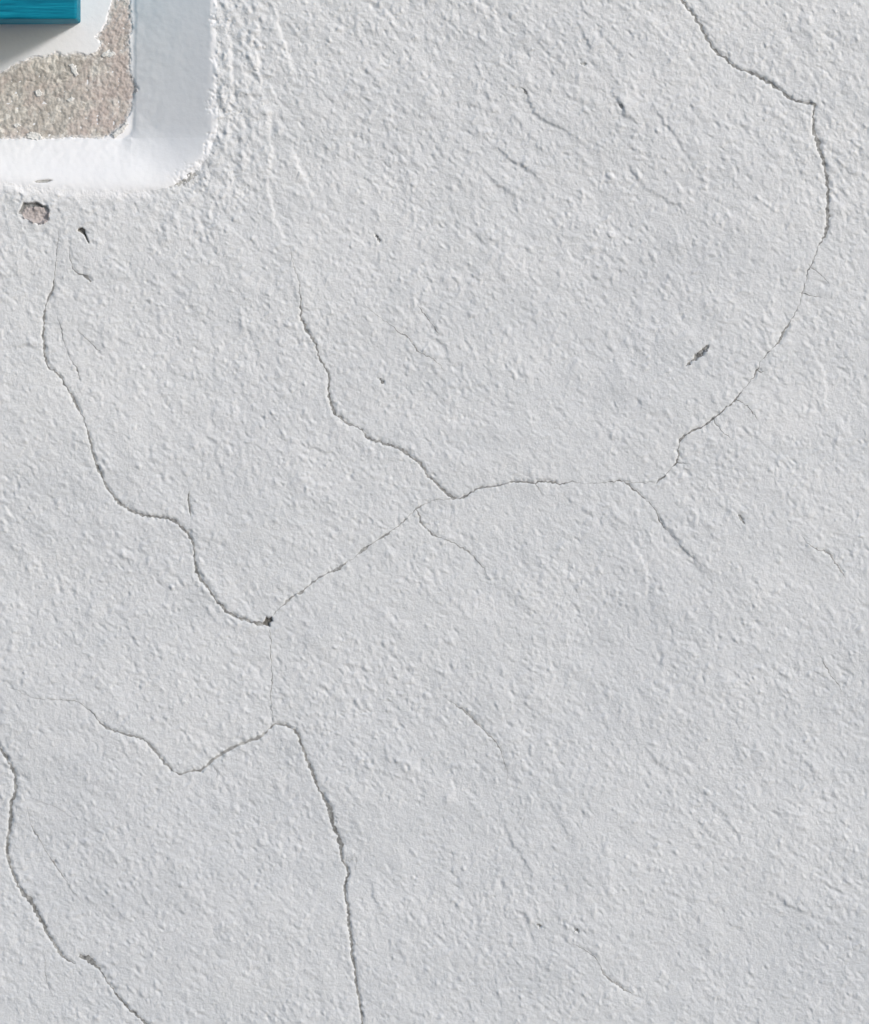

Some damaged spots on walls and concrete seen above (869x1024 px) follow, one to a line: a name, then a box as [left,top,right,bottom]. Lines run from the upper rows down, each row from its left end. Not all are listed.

flaking render [0,0,138,141]
flaking render [18,202,50,225]
crack [56,231,91,282]
crack [587,0,833,528]
crack [801,535,844,575]
crack [33,258,577,1024]
crack [0,748,148,1024]
crack [574,944,632,994]